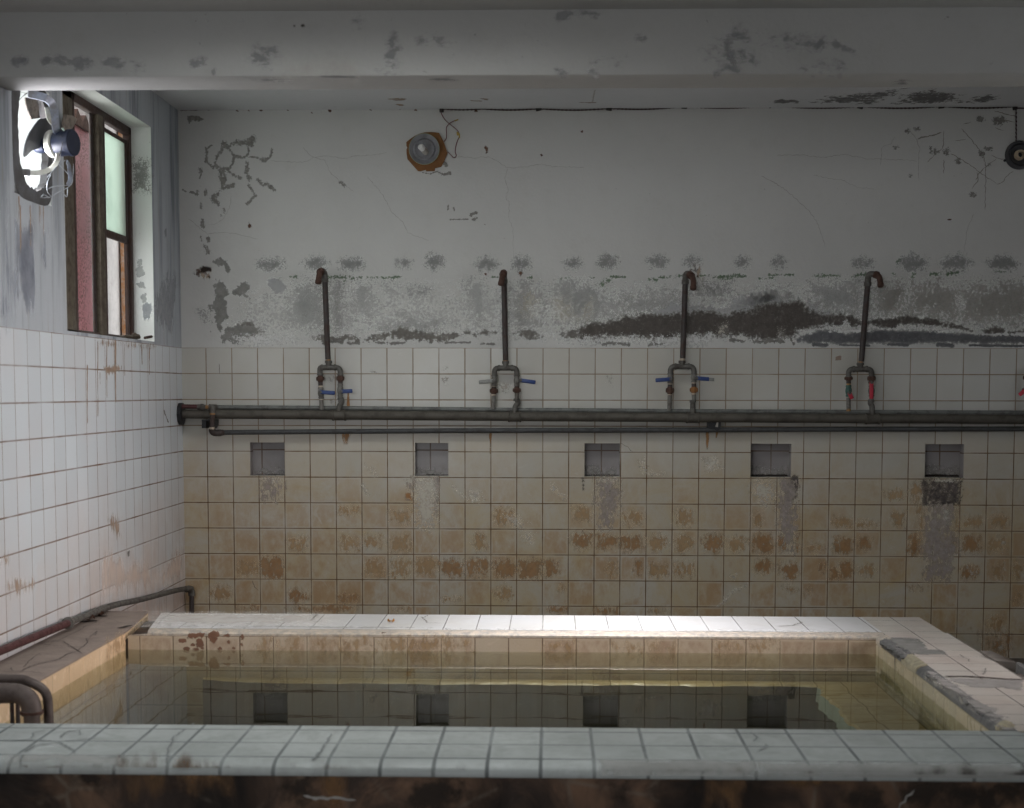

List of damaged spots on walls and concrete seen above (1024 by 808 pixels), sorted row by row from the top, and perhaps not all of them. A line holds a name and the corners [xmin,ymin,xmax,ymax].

spalling [182,145,265,344]
damp [230,251,1024,347]
damp [573,475,821,591]
damp [888,478,1007,582]
rust [178,630,244,651]
spalling [879,638,948,659]
peeling [928,671,1024,730]